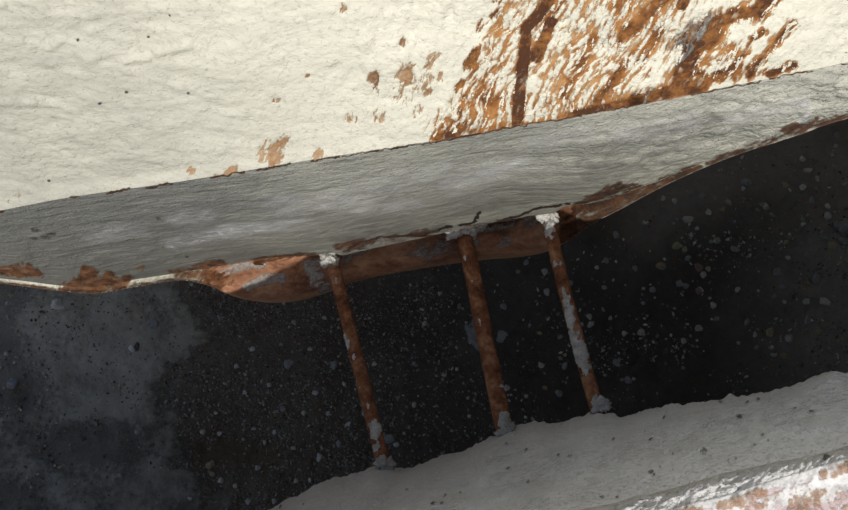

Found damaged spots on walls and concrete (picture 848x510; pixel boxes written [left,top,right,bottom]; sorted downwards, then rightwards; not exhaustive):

corrosion [367,70,379,93]
corrosion [393,52,443,118]
corrosion [428,0,799,142]
corrosion [256,134,290,167]
corrosion [0,260,234,294]
peeling [220,262,287,291]
corrosion [253,253,315,265]
peeling [303,257,337,294]
corrosion [333,239,376,253]
peeling [562,287,592,376]
peeling [368,418,382,452]
spalling [581,445,848,510]